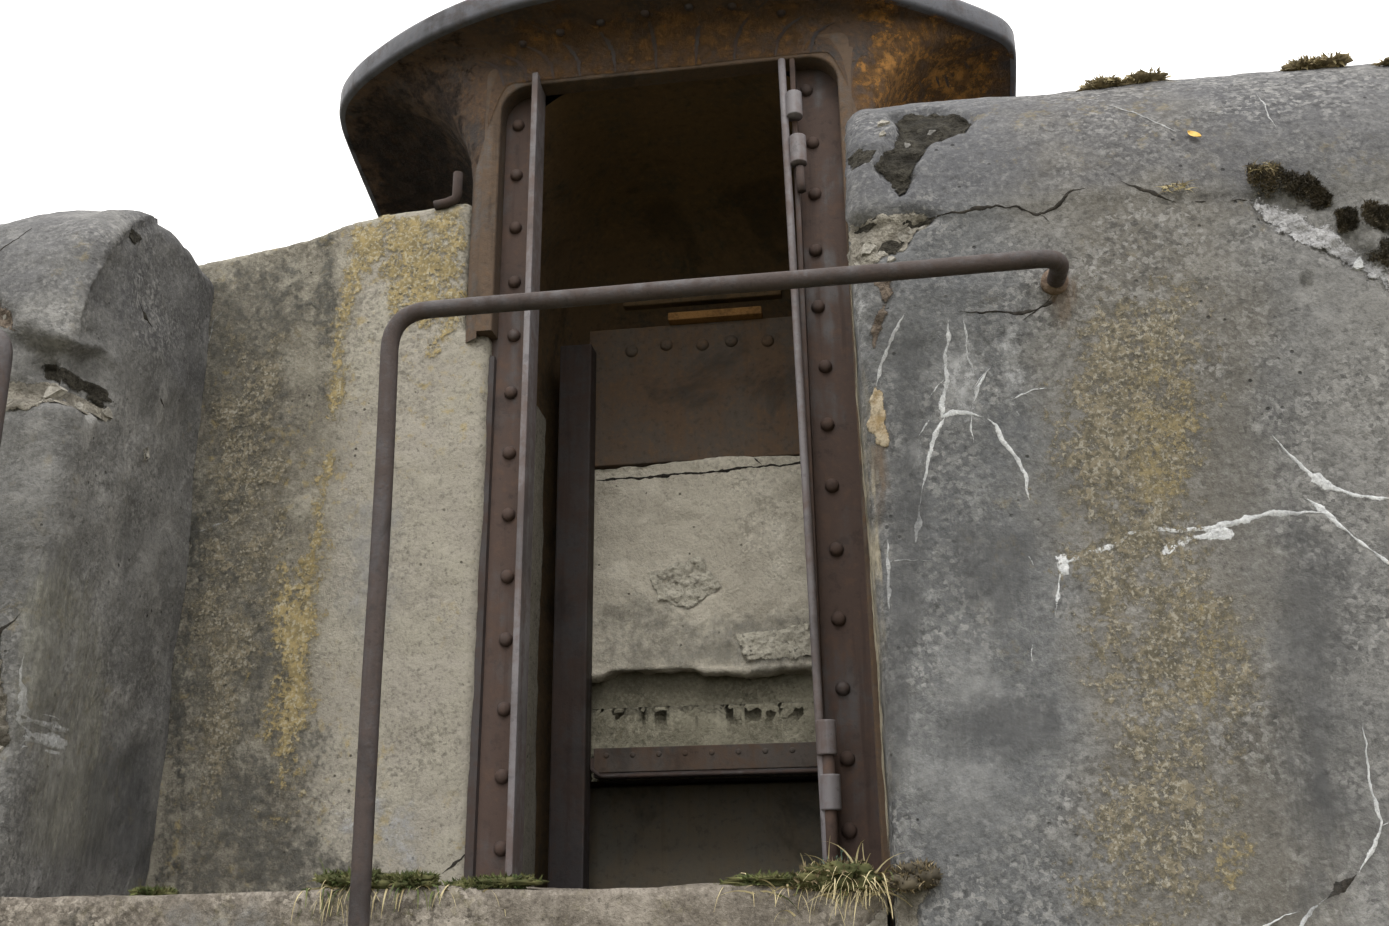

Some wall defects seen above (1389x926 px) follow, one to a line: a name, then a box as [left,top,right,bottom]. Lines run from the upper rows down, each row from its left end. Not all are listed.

rust [853,0,1011,108]
rust [346,57,475,217]
spalling [846,113,972,195]
spalling [847,212,944,266]
spalling [1250,197,1389,291]
spalling [6,364,114,421]
crack [597,458,800,481]
crack [890,294,1058,562]
crack [1029,435,1389,615]
water stain [121,513,204,882]
water stain [251,539,335,825]
crack [1263,727,1388,926]